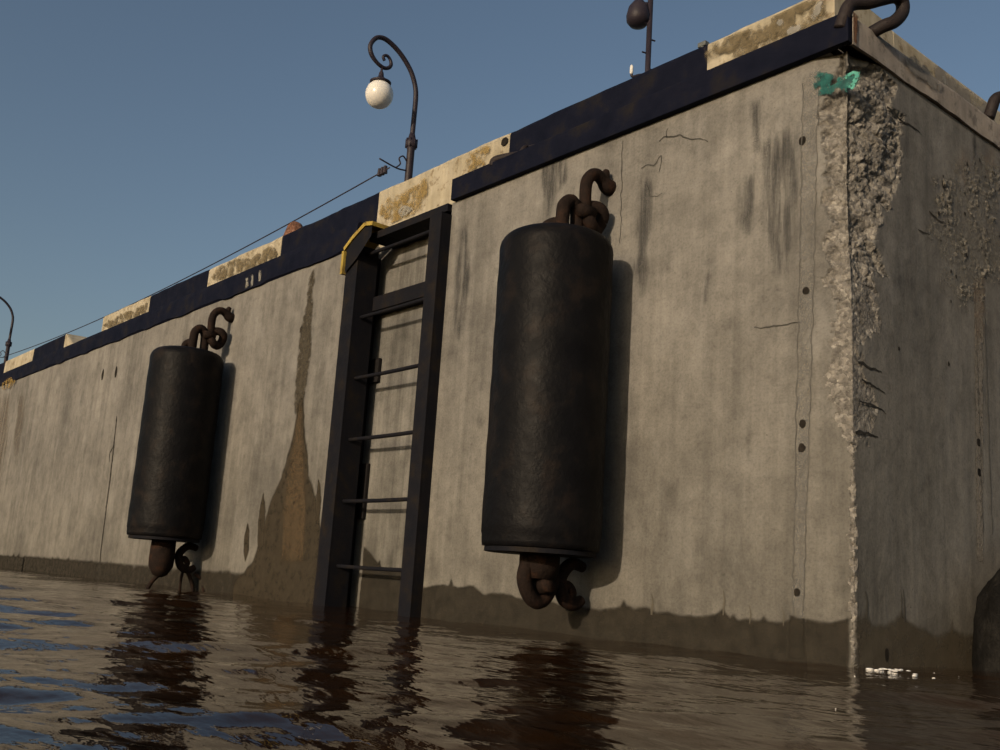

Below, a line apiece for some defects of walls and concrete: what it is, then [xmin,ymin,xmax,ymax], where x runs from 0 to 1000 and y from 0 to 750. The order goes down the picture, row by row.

crack [619,131,708,243]
water stain [0,271,321,604]
spalling [814,58,905,661]
water stain [421,580,973,669]